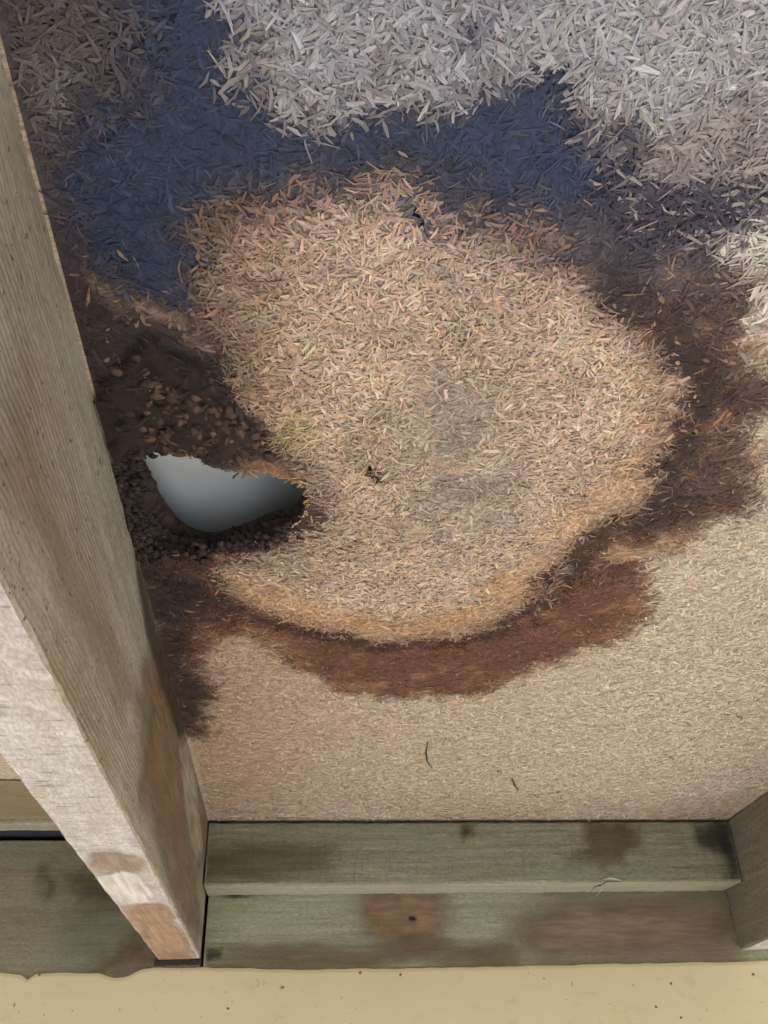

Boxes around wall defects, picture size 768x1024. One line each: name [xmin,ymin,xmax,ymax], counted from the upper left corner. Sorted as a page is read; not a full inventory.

leakage [0,0,768,739]
peeling [190,412,768,820]
leakage [585,823,634,860]